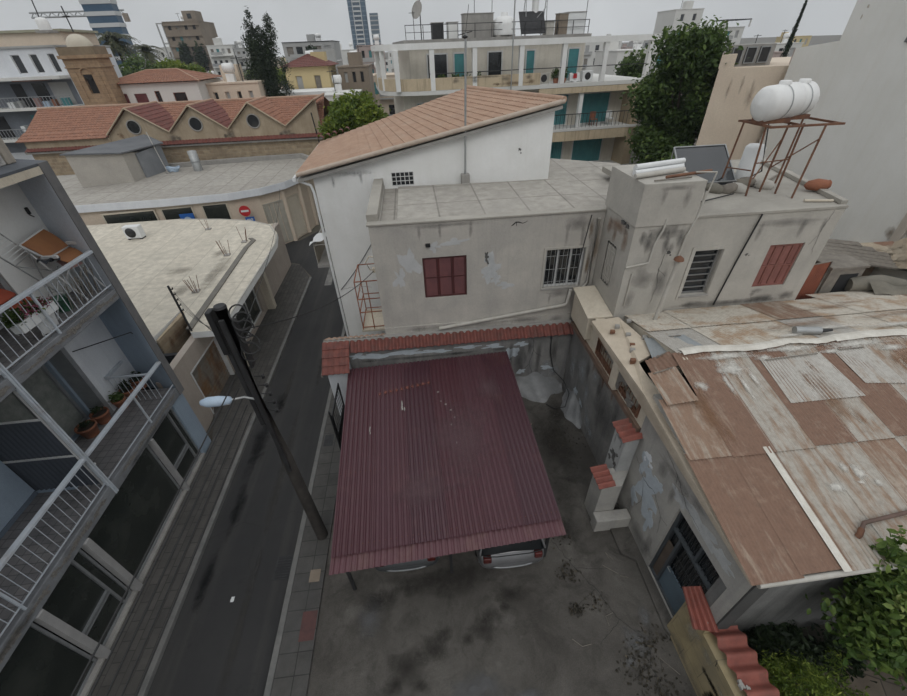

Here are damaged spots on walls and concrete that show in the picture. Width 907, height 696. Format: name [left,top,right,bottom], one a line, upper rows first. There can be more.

peeling [392,247,422,288]
peeling [631,451,735,578]